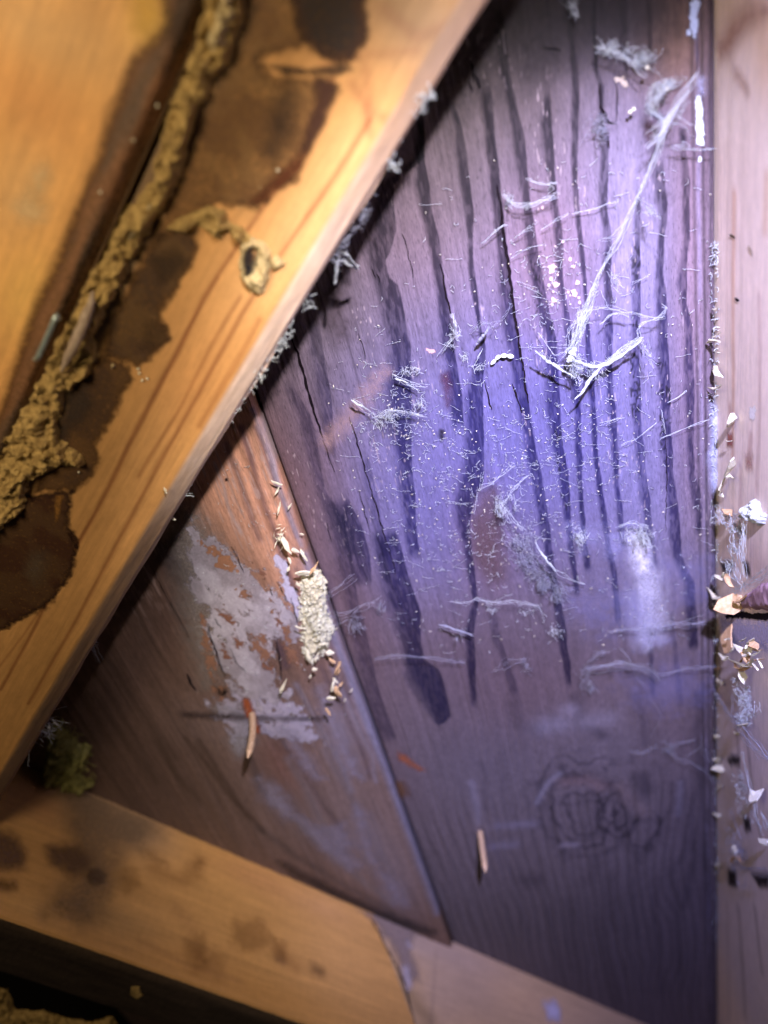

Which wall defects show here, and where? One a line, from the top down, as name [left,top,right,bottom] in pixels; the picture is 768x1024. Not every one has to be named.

leakage [0,0,369,630]
crack [291,338,335,472]
peeling [197,539,266,600]
peeling [200,598,305,709]
leakage [0,835,24,869]
leakage [0,919,301,1024]